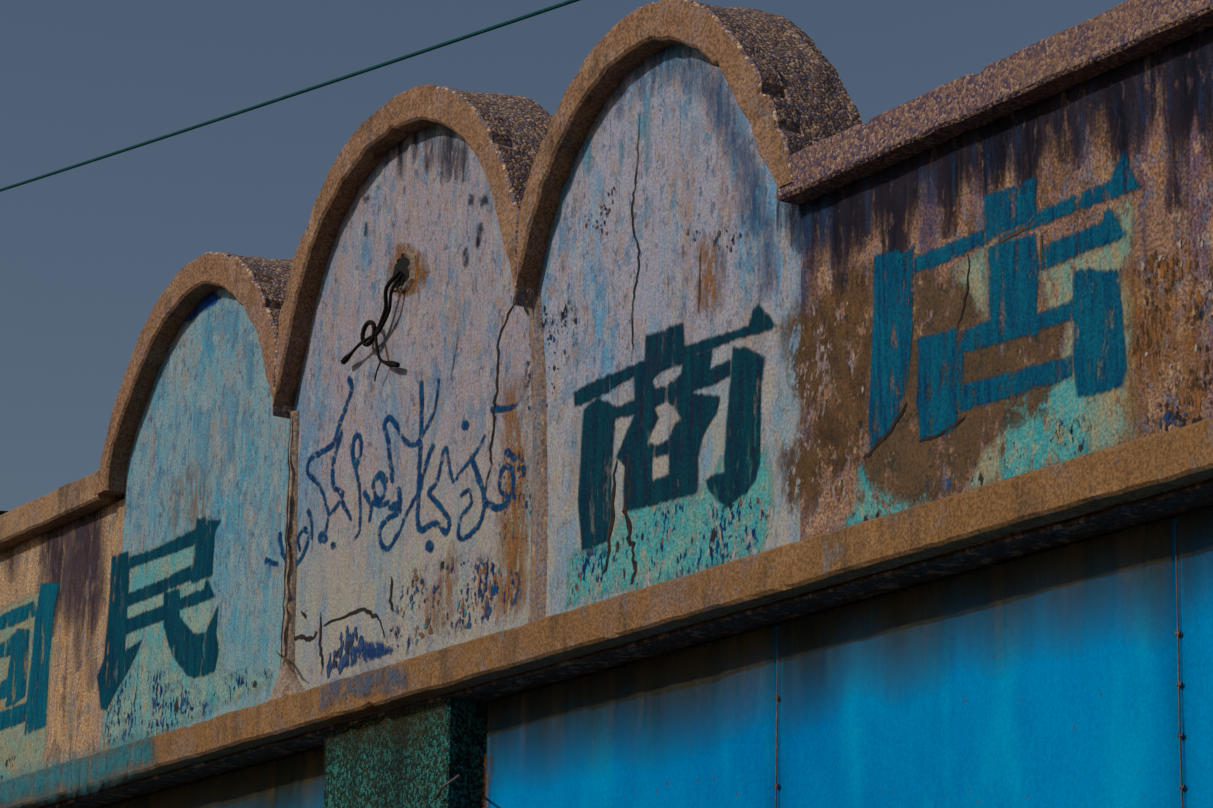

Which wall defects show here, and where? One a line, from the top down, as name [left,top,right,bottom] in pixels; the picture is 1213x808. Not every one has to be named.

crack [484,295,528,493]
rust [498,382,527,609]
crack [602,452,636,584]
crack [631,118,640,354]
spalling [567,198,1213,606]
leakage [707,26,1213,285]
crack [957,253,970,330]
crack [996,221,1042,271]